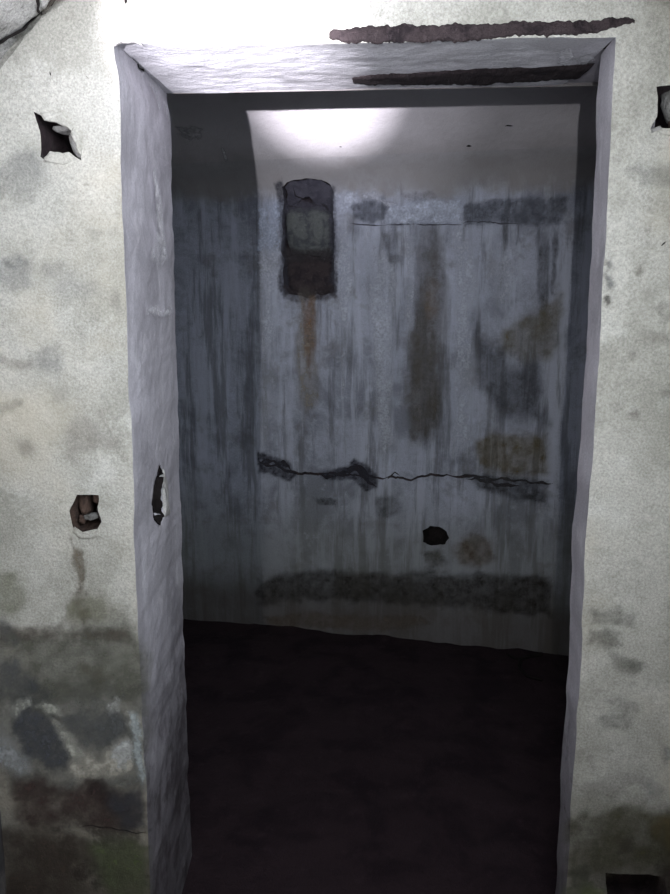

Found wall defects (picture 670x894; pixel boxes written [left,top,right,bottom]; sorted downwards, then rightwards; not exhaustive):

crack [0,0,55,44]
rust [329,17,635,44]
hole [651,85,670,136]
hole [34,112,82,165]
leakage [338,192,566,230]
leakage [258,453,296,481]
leakage [322,460,377,491]
crack [259,460,553,487]
hole [69,495,101,539]
spalling [423,526,449,546]
leakage [0,627,147,828]
spalling [605,873,667,894]